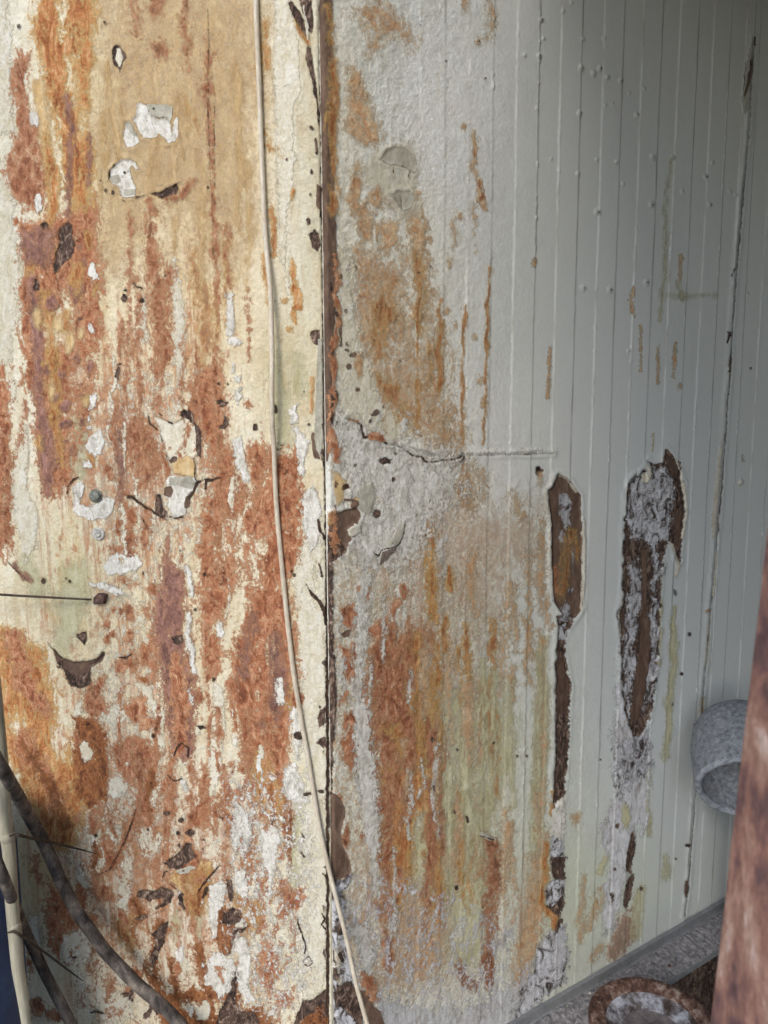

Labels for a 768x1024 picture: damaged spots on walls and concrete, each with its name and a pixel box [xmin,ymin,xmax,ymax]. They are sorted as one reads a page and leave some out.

peeling [100,103,209,210]
spalling [50,647,104,688]
peeling [66,355,201,555]
rust [0,0,312,1024]
spalling [114,683,219,921]
spalling [299,463,382,562]
spalling [371,521,406,571]
rust [344,161,491,512]
crack [306,0,552,1024]
rust [327,502,560,1001]
spalling [543,474,587,933]
spalling [617,449,688,737]